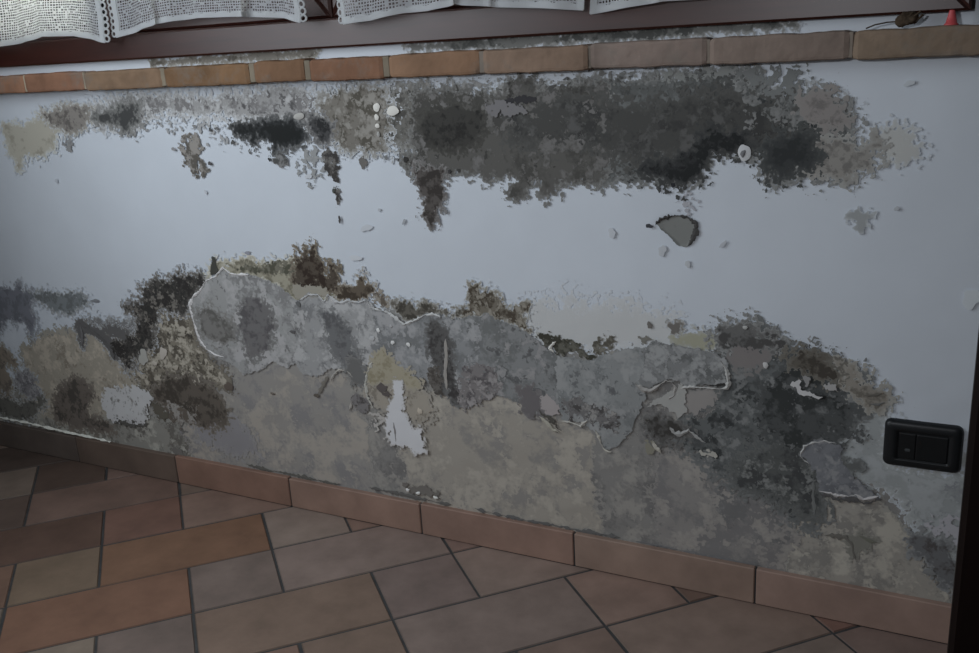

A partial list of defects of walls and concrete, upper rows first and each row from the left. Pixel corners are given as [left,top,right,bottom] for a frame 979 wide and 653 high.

damp [0,63,936,235]
flaking render [657,215,694,247]
damp [232,236,691,421]
damp [383,376,428,457]
flaking render [0,269,953,604]
damp [561,396,621,434]
damp [636,306,967,600]